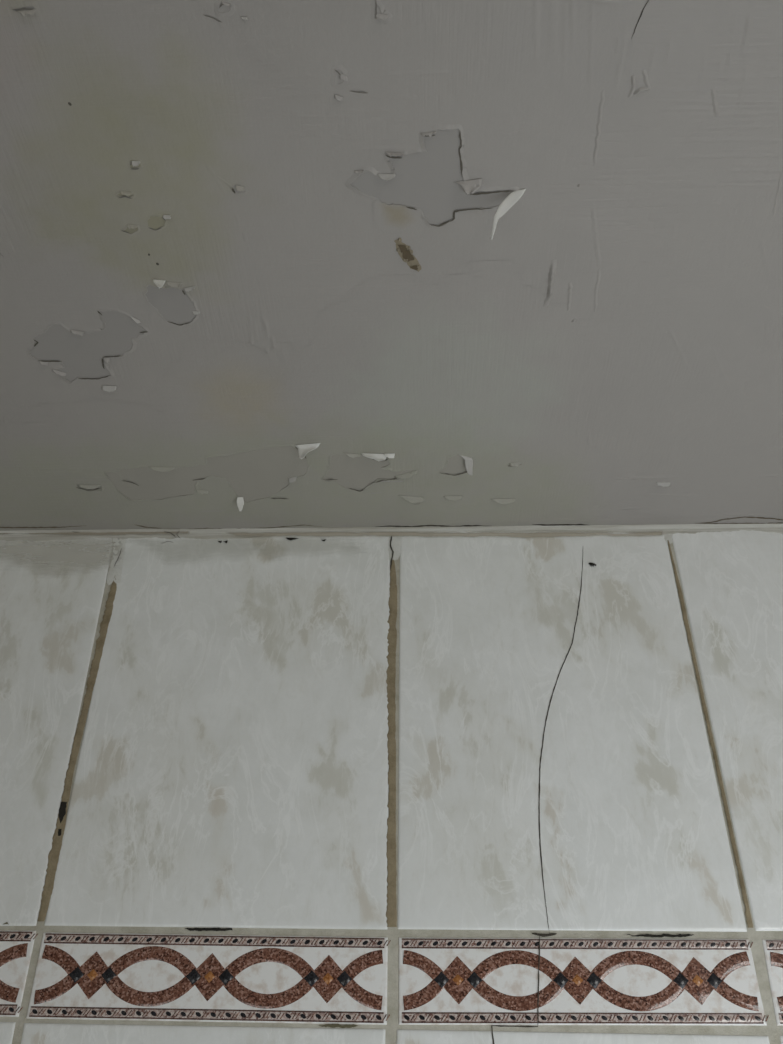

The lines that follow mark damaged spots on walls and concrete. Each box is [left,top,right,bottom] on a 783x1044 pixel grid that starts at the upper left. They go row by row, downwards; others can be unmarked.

peeling [345,124,526,239]
peeling [321,452,418,492]
crack [491,557,583,1044]